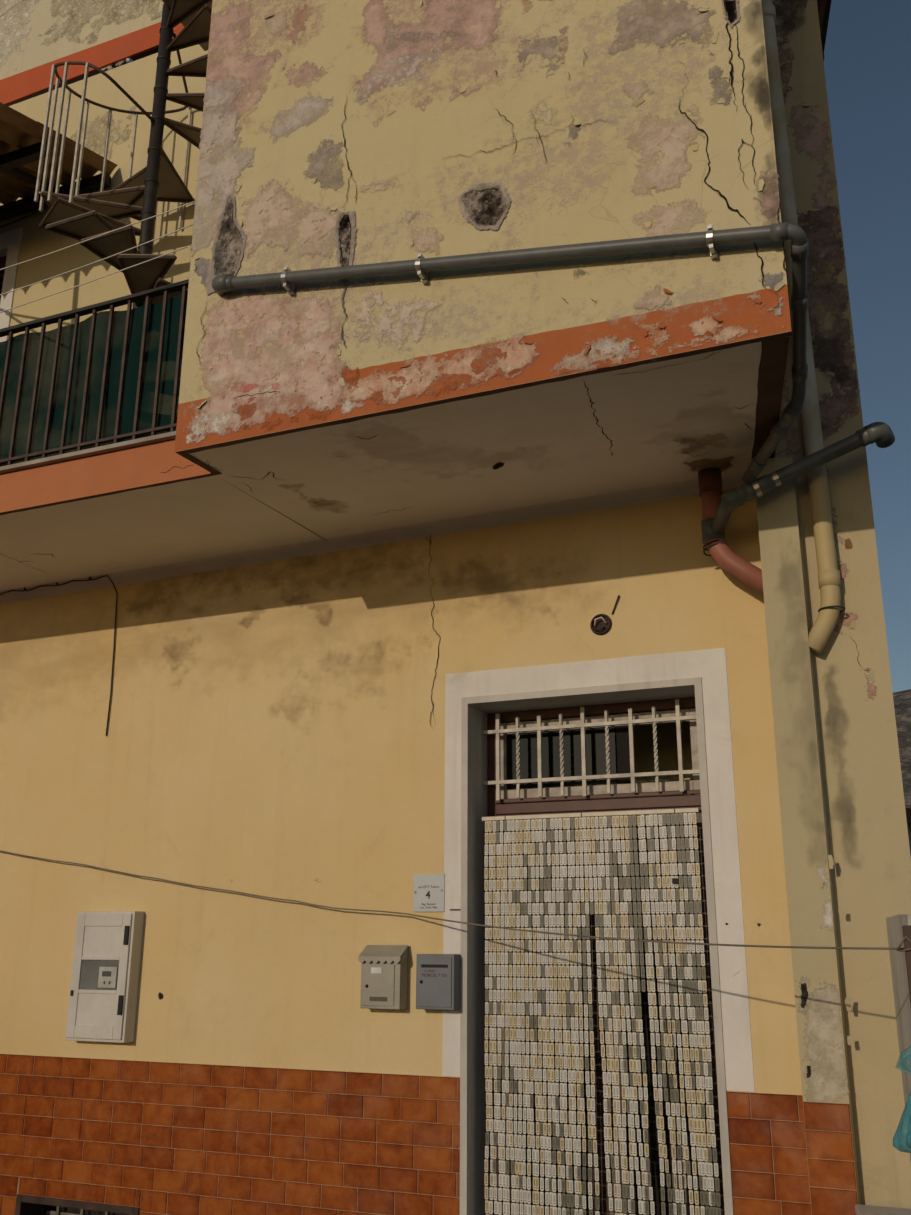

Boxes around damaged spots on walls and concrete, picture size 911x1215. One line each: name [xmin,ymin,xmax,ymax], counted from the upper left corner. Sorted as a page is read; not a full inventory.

peeling [38,0,162,46]
peeling [517,26,569,77]
peeling [607,0,741,107]
crack [342,94,357,205]
crack [677,0,788,309]
peeling [182,0,539,443]
peeling [633,198,703,237]
crack [340,283,348,348]
spalling [553,272,789,376]
peeling [797,206,860,437]
crack [584,382,613,456]
crack [425,535,440,727]